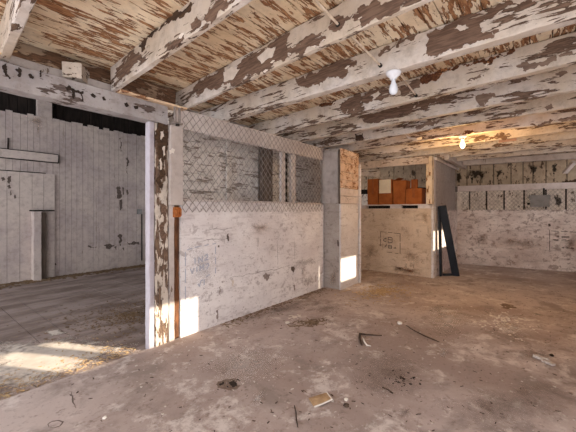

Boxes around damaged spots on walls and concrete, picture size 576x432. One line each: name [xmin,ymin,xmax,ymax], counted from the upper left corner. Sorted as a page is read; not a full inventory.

peeling [191,0,235,32]
peeling [116,2,194,80]
peeling [378,34,417,57]
peeling [193,32,326,97]
peeling [295,59,357,88]
peeling [399,48,515,95]
peeling [509,51,573,83]
peeling [319,87,391,114]
peeling [361,93,454,124]
peeling [456,130,511,142]
peeling [154,122,175,188]
peeling [159,204,167,245]